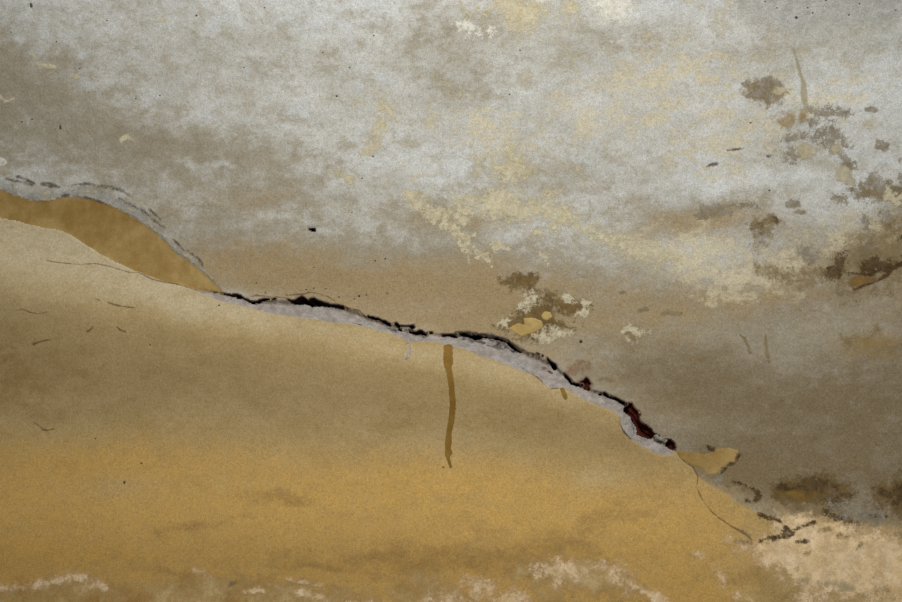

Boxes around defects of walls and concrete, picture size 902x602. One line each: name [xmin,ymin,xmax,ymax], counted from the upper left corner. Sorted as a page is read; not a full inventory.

water stain [694,48,902,296]
peeling [0,139,740,485]
crack [140,273,751,539]
water stain [492,271,592,345]